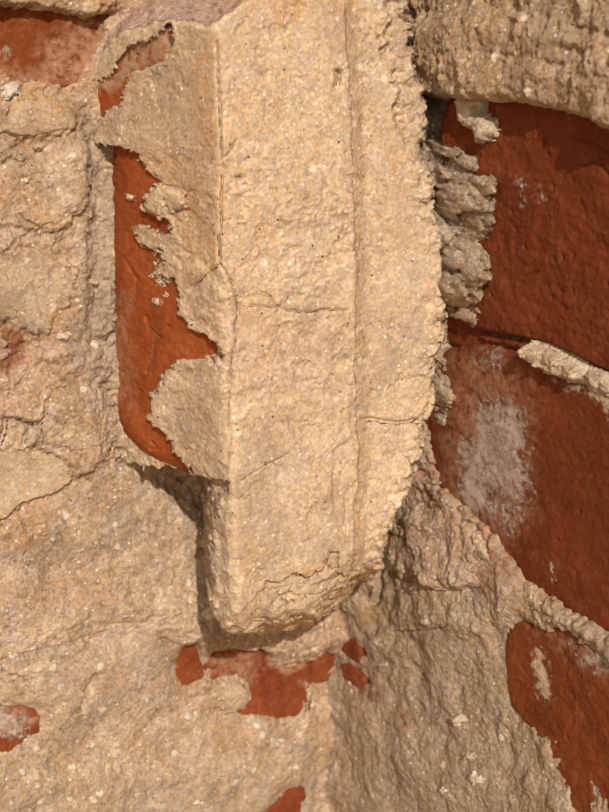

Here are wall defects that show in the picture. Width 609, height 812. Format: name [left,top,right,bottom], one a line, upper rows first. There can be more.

spalling [125,182,188,219]
spalling [139,244,172,306]
efflorescence [457,387,536,535]